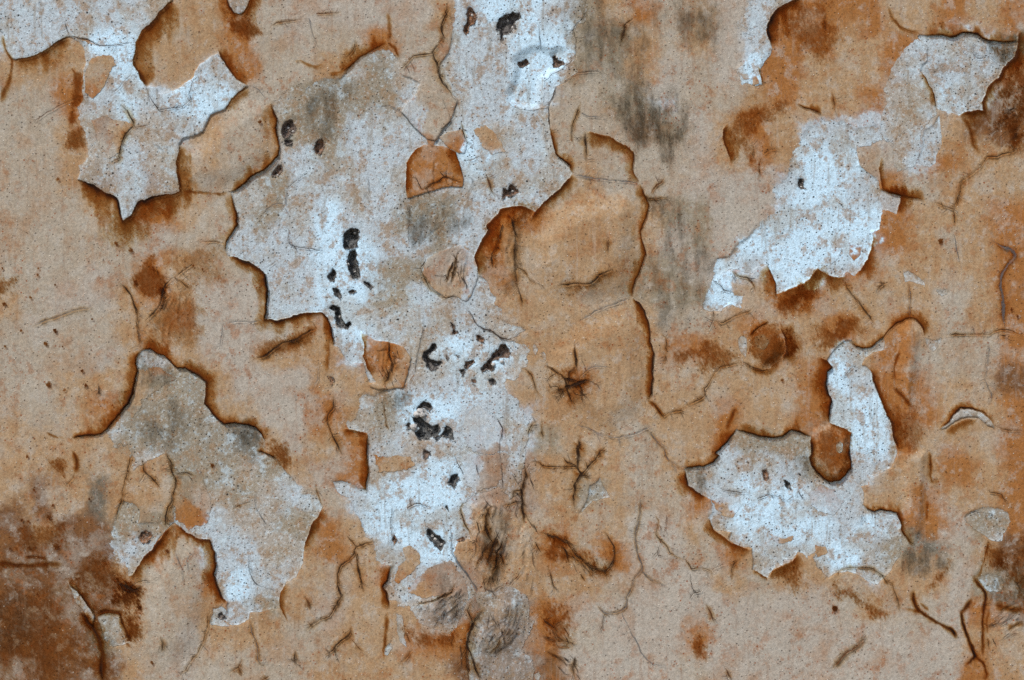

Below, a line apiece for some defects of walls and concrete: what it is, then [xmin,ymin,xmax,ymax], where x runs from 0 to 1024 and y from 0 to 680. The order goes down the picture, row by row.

peeling [0,0,247,220]
peeling [736,0,792,86]
peeling [703,33,1018,312]
peeling [226,0,588,680]
peeling [738,334,769,357]
crack [952,245,1016,398]
rust [112,577,145,645]
peeling [106,349,323,626]
crack [417,347,766,680]
crack [720,488,805,502]
peeling [685,338,904,584]